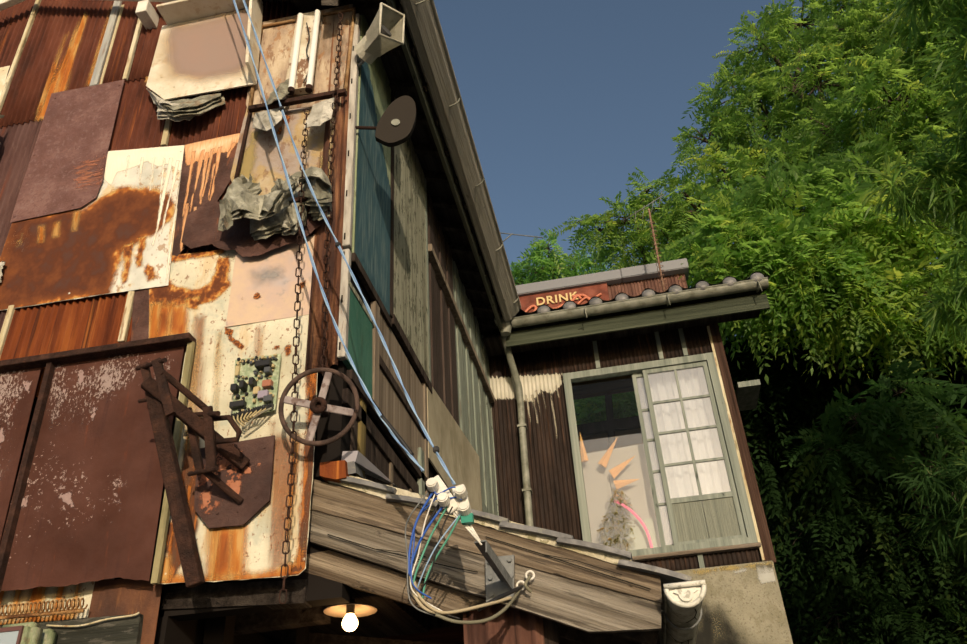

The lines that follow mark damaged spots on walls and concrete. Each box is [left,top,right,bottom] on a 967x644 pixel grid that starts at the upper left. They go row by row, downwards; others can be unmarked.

corrosion [37,14,88,120]
corrosion [0,186,230,380]
corrosion [225,327,244,350]
peeling [0,369,32,442]
peeling [48,354,149,425]
peeling [11,444,126,538]
corrosion [181,373,317,581]
corrosion [160,522,185,583]